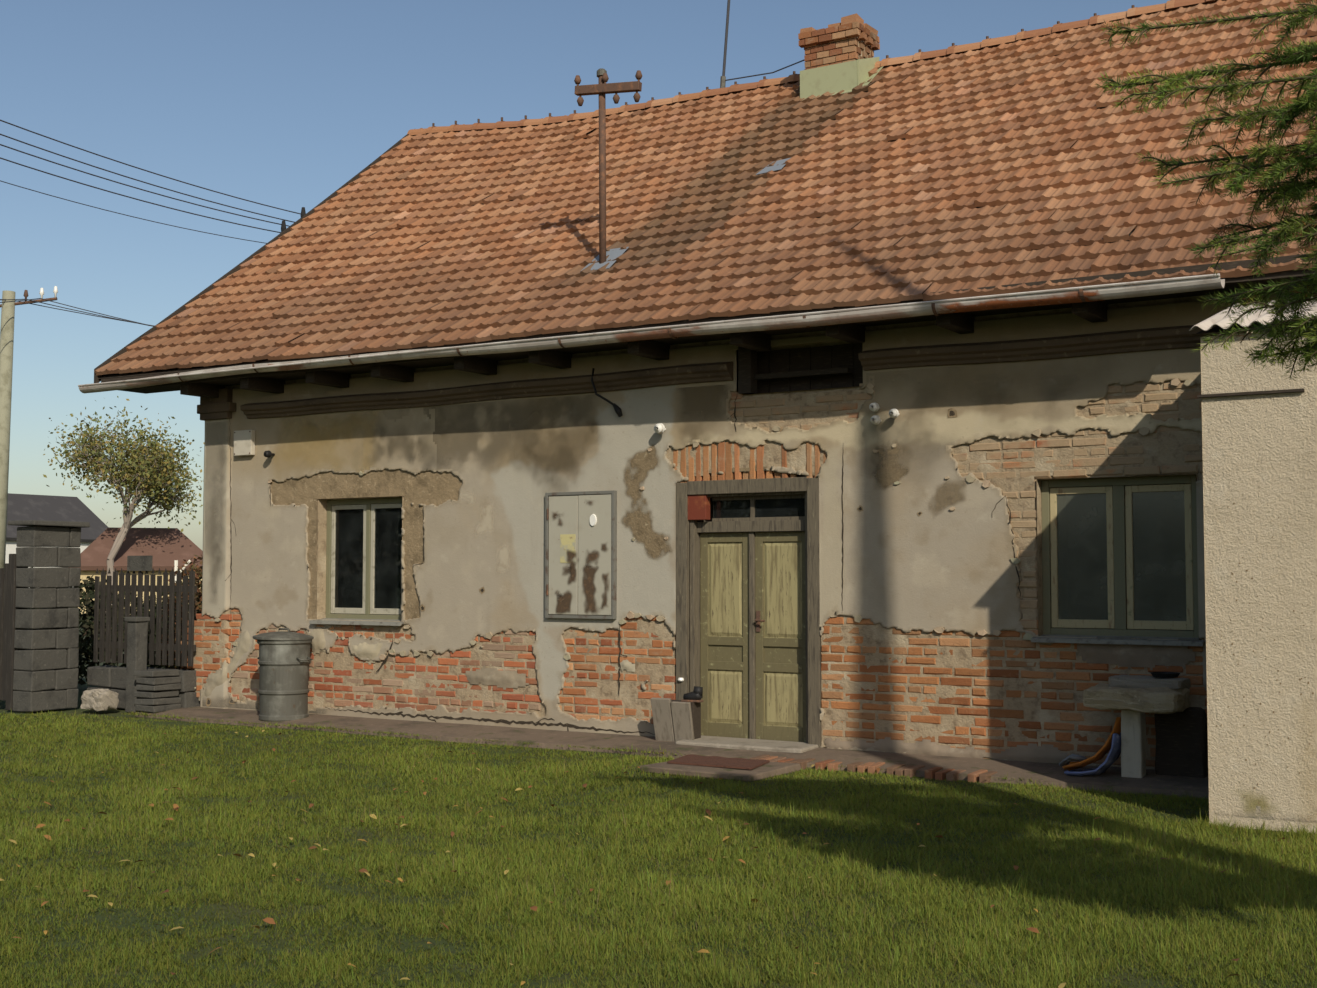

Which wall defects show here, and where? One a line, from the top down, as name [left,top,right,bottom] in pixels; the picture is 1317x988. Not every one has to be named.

spalling [623,382,875,558]
crack [992,495,1021,596]
spalling [821,378,1246,768]
spalling [181,608,676,724]